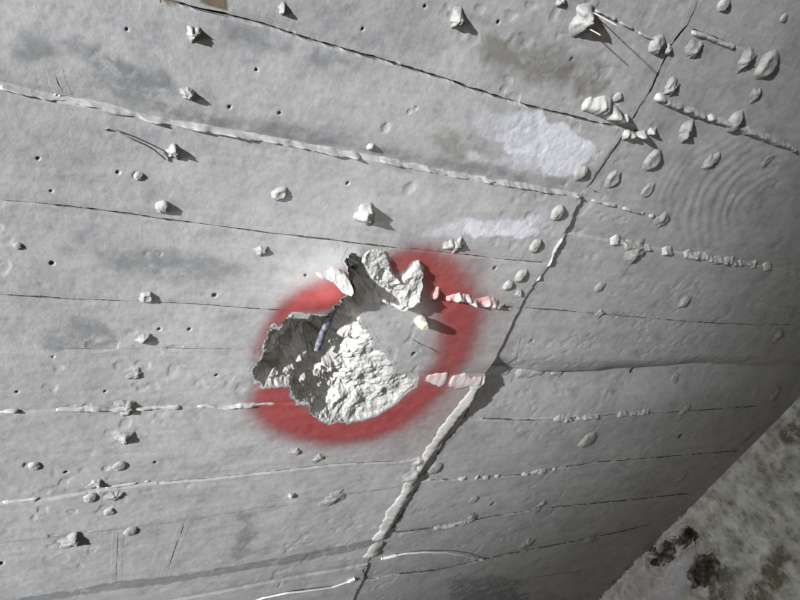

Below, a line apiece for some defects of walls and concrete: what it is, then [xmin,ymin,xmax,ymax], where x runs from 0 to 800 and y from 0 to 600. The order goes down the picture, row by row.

crack [0,0,800,367]
damp [468,109,597,178]
spalling [246,244,424,426]